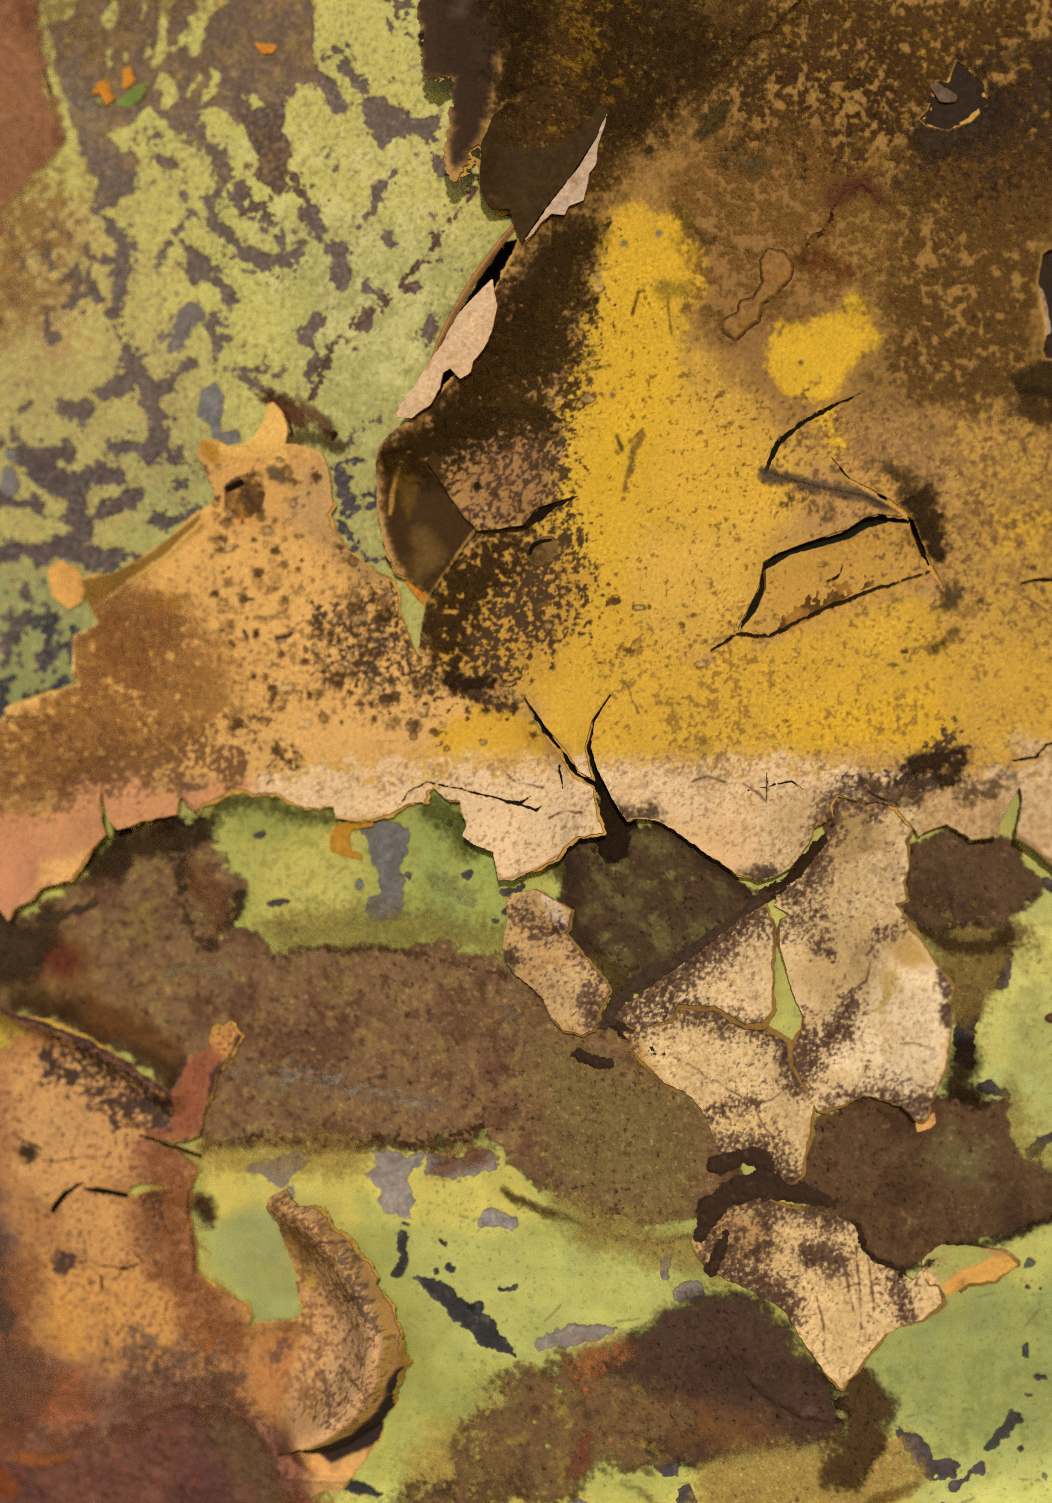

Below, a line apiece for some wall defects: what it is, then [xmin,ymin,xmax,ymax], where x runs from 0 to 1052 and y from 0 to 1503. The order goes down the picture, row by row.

crack [703,0,802,90]
water stain [482,0,1052,428]
crack [765,393,860,471]
peeling [0,0,1052,1185]
crack [710,467,930,651]
crack [399,695,611,812]
peeling [0,1007,519,1503]
peeling [534,1323,618,1352]
peeling [660,1197,1042,1391]
corrosion [0,1377,333,1503]